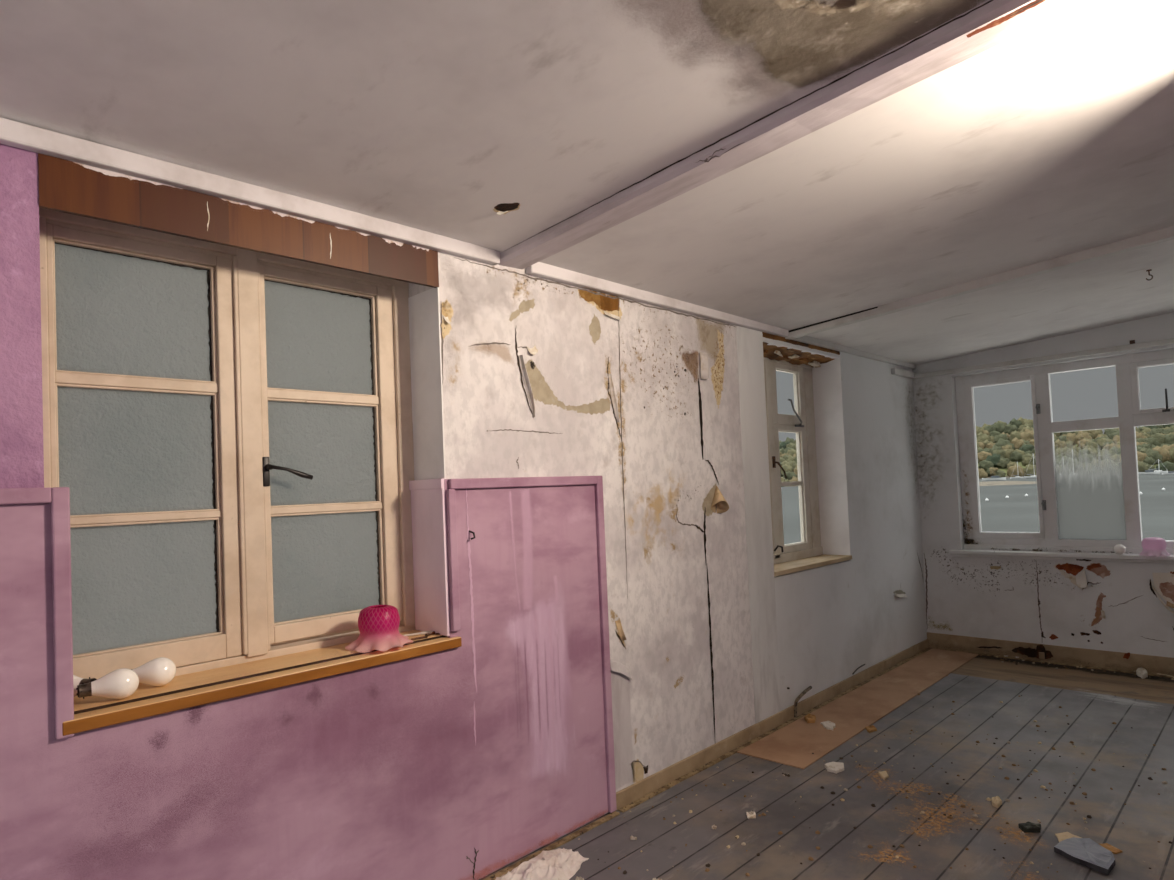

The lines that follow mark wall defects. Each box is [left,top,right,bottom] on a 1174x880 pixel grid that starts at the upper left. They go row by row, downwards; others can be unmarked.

water stain [584,0,988,117]
peeling [75,162,183,189]
peeling [221,198,315,223]
peeling [578,289,622,344]
peeling [515,329,610,418]
crack [676,514,705,533]
water stain [932,473,1135,597]
spalling [1049,559,1111,644]
peeling [1149,571,1174,614]